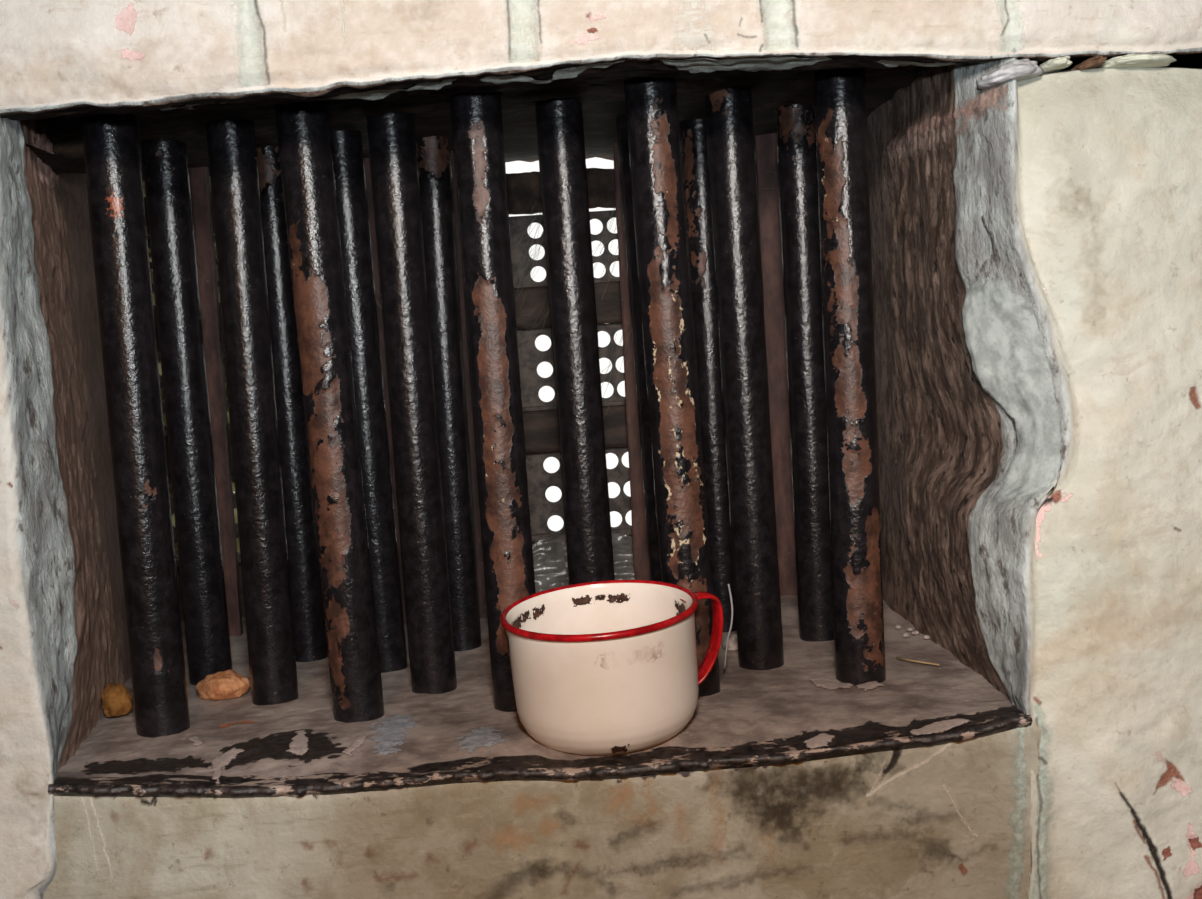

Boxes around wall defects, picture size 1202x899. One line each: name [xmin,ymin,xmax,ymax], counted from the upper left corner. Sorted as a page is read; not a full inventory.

peeling [83,714,417,799]
peeling [456,727,507,754]
peeling [774,705,1020,762]
peeling [1154,753,1192,797]
crack [1120,794,1172,899]
peeling [1182,823,1202,899]